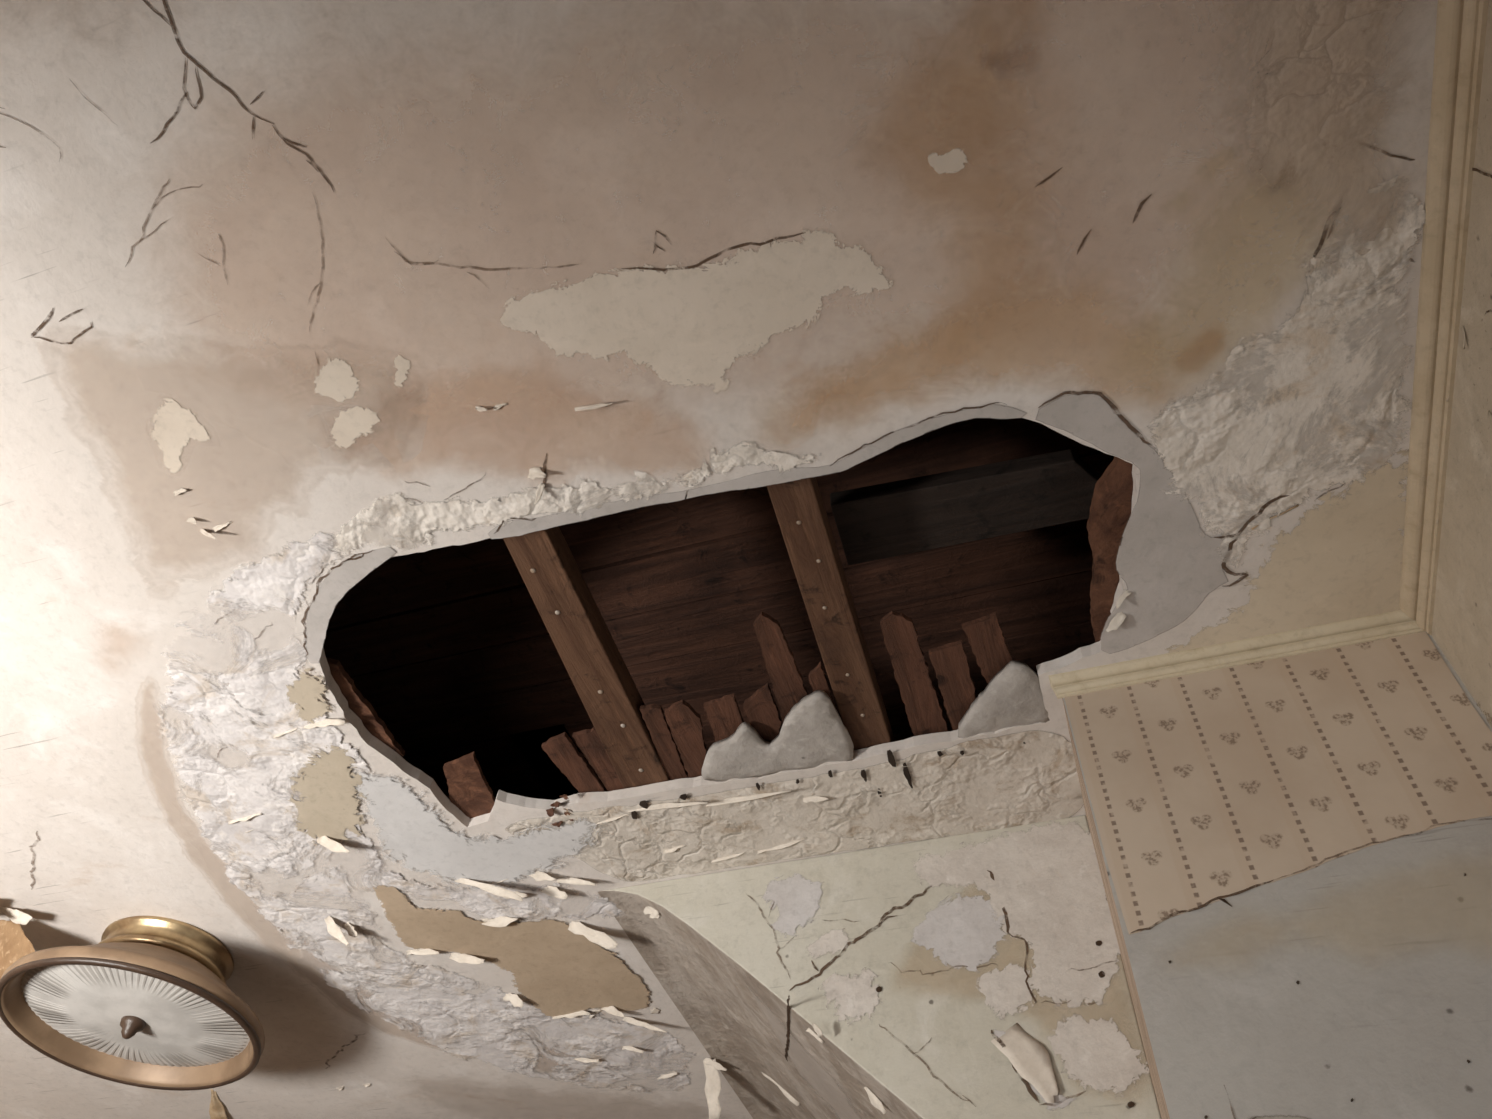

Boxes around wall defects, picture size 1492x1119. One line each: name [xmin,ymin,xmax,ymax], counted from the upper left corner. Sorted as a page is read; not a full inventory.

crack [126,179,197,265]
crack [143,0,334,364]
crack [392,246,575,280]
peeling [500,229,893,394]
crack [621,230,806,271]
peeling [150,398,212,496]
peeling [313,358,380,450]
flaking render [488,391,1299,654]
spalling [958,661,1049,738]
peeling [273,547,854,1033]
peeling [806,929,883,1025]
peeling [911,820,1150,1110]